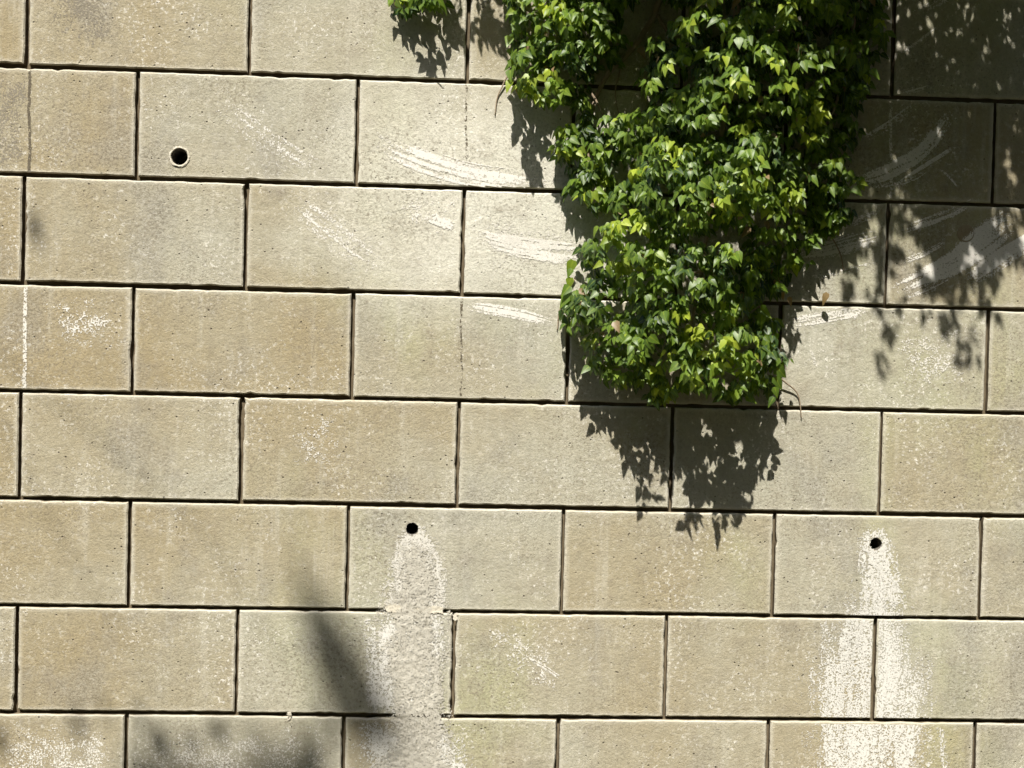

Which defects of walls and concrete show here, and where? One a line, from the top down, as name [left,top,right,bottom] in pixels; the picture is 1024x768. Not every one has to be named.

crack [25,70,33,172]
damp [351,520,475,768]
damp [792,527,948,768]